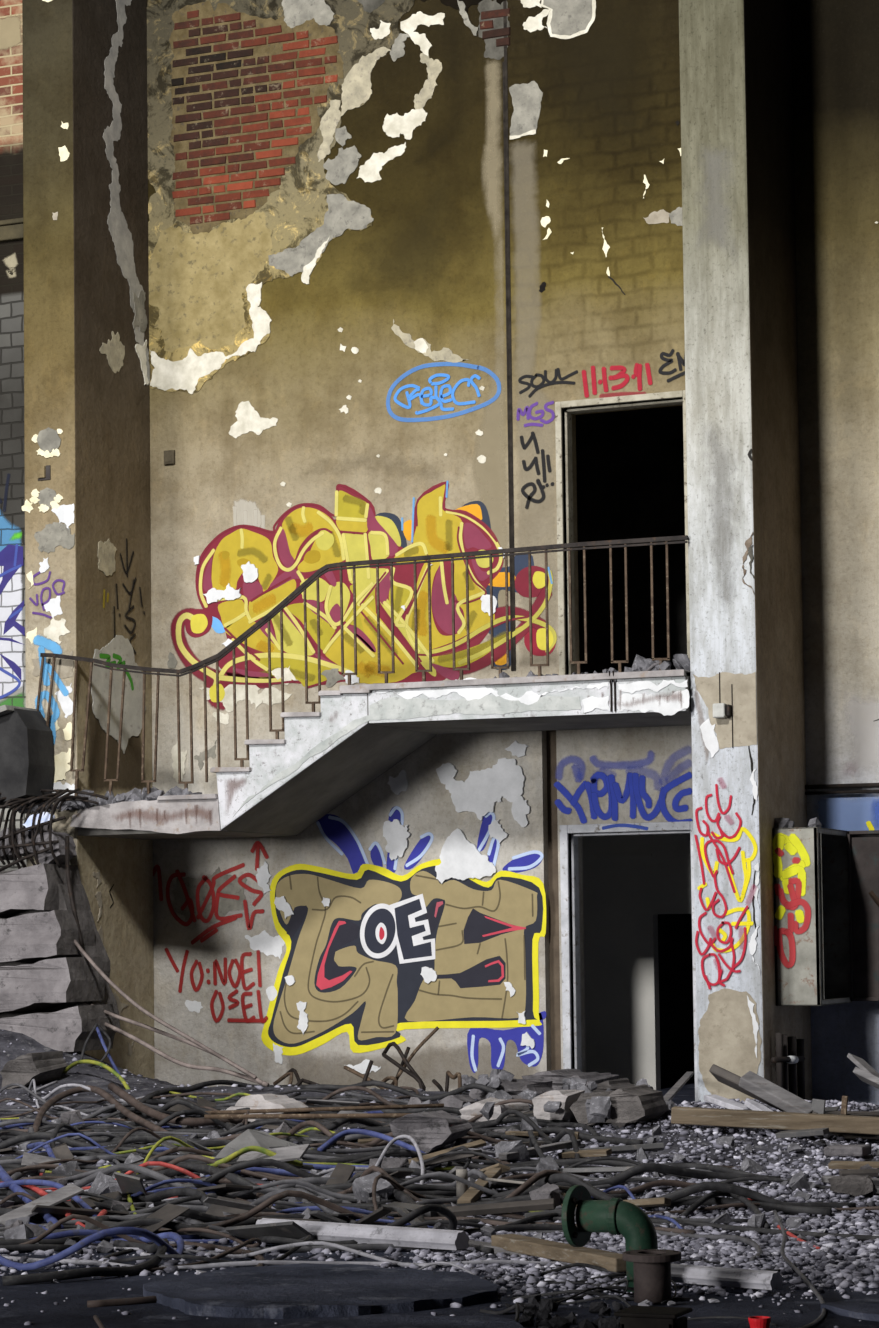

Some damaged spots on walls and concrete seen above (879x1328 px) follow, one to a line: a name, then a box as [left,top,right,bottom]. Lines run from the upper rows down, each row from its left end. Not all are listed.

flaking render [99,0,592,394]
flaking render [643,207,682,226]
peeling [229,401,278,439]
peeling [435,740,530,884]
peeling [383,819,411,860]
peeling [421,967,438,984]
peeling [296,1001,309,1035]
peeling [517,1011,535,1049]